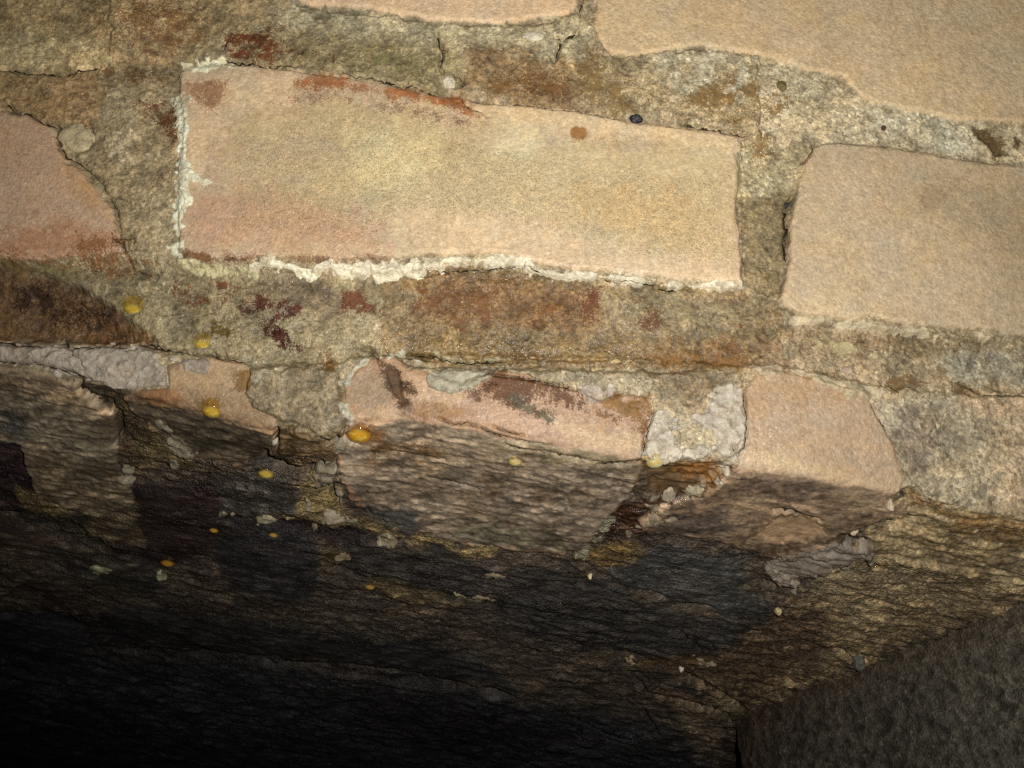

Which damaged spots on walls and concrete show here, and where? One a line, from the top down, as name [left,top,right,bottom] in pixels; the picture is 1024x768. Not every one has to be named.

water stain [179,56,234,75]
rust [82,0,479,158]
water stain [166,94,743,293]
water stain [210,320,230,338]
water stain [580,382,615,403]
water stain [155,420,198,470]
water stain [117,464,136,485]
water stain [305,402,439,531]
water stain [625,381,749,538]
water stain [256,515,292,526]
water stain [377,532,398,549]
water stain [90,565,112,575]